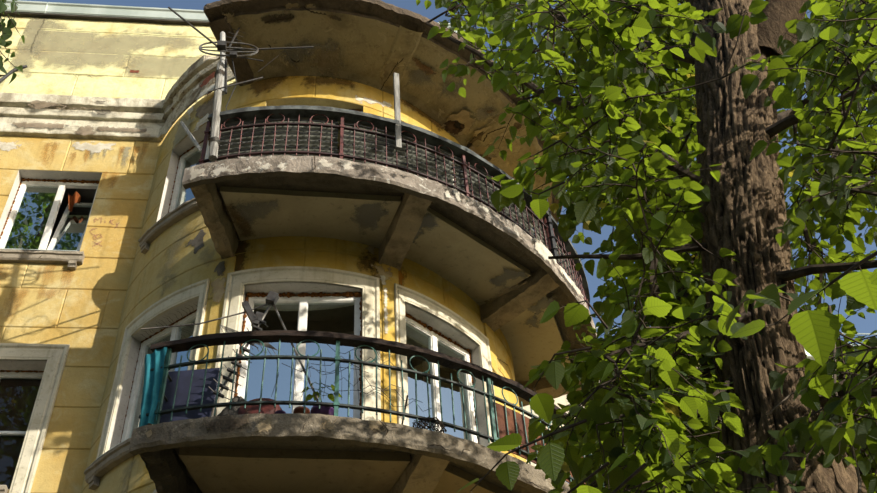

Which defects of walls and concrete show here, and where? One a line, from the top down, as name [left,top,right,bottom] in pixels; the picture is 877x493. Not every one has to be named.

damp [13,17,198,79]
damp [250,76,288,96]
damp [305,76,354,88]
damp [400,99,444,131]
spalling [442,110,524,161]
flaking render [185,229,207,254]